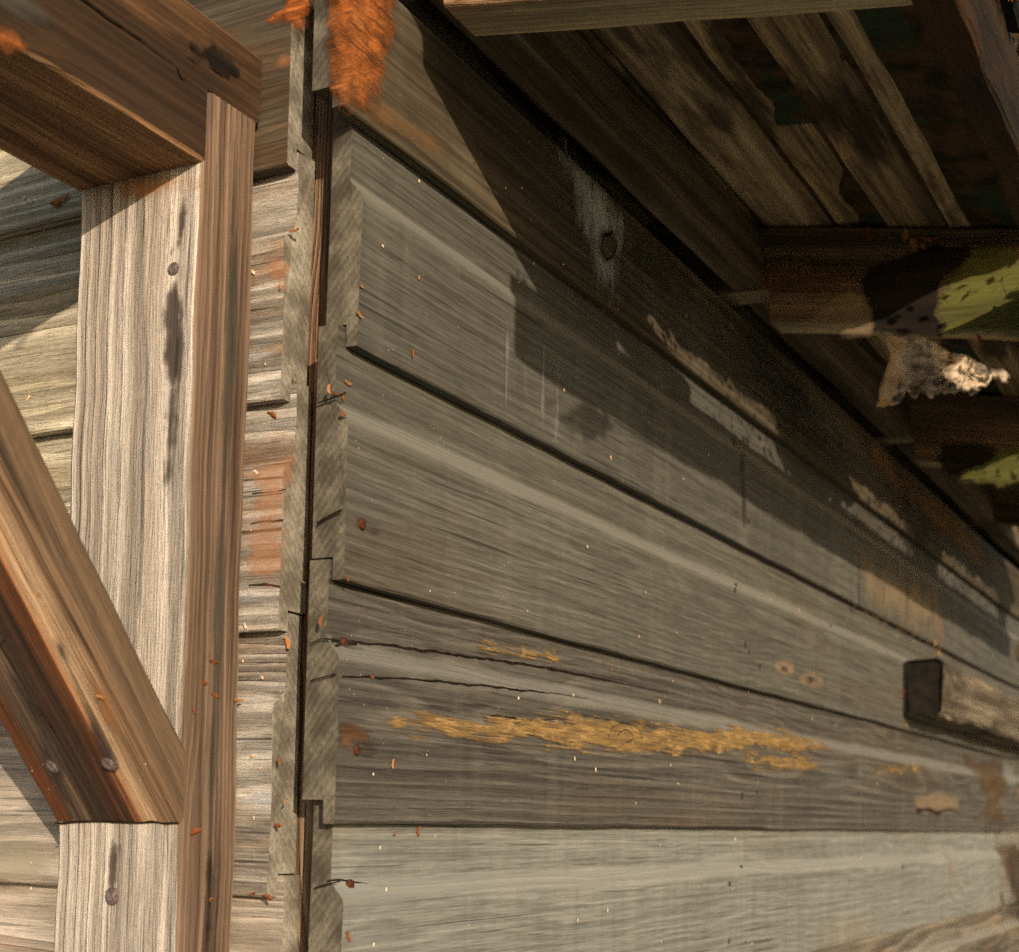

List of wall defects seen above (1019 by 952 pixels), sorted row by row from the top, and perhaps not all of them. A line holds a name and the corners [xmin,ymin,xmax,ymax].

damp [163,283,183,479]
crack [310,638,666,698]
crack [491,713,564,721]
peeling [387,711,828,772]